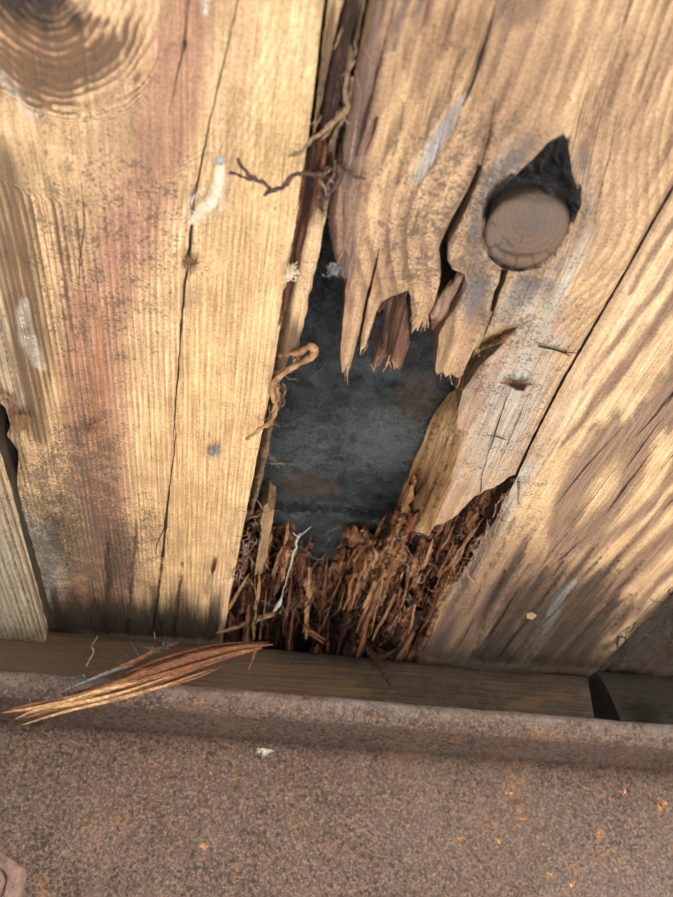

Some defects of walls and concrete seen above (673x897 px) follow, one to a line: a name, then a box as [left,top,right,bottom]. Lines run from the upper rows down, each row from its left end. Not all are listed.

crack [594,112,618,224]
crack [153,0,239,638]
peeling [500,382,533,391]